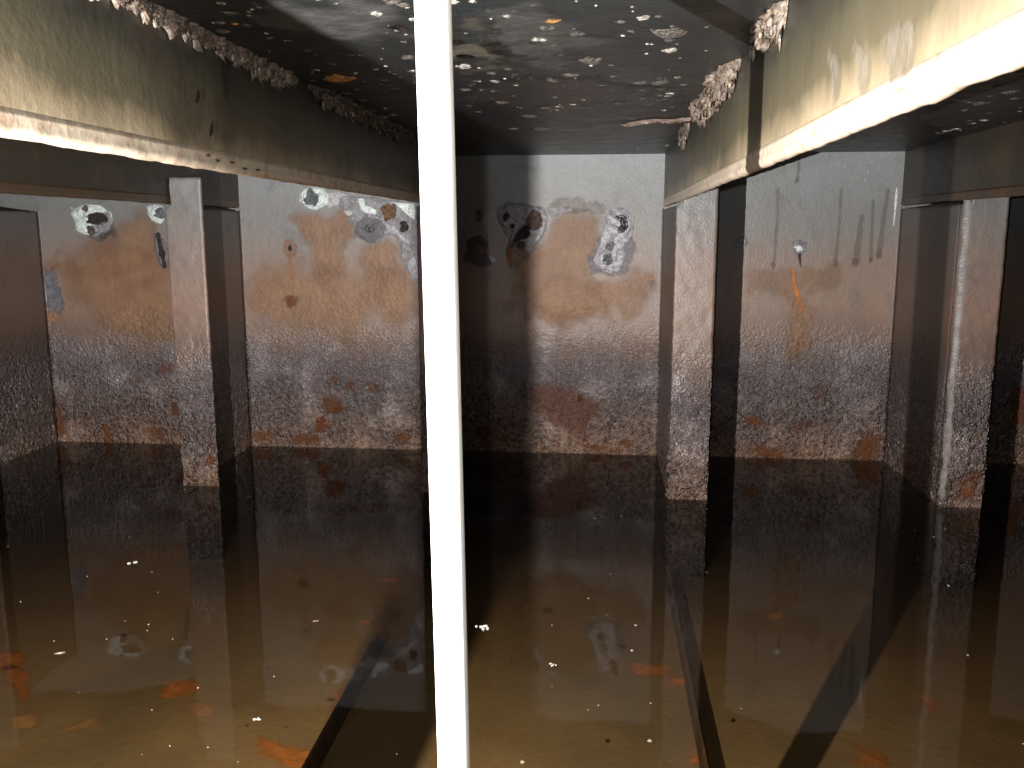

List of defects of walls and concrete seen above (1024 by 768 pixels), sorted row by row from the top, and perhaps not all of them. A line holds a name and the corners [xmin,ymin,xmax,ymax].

spalling [212,2,260,34]
rust [339,195,418,282]
rust [517,216,652,326]